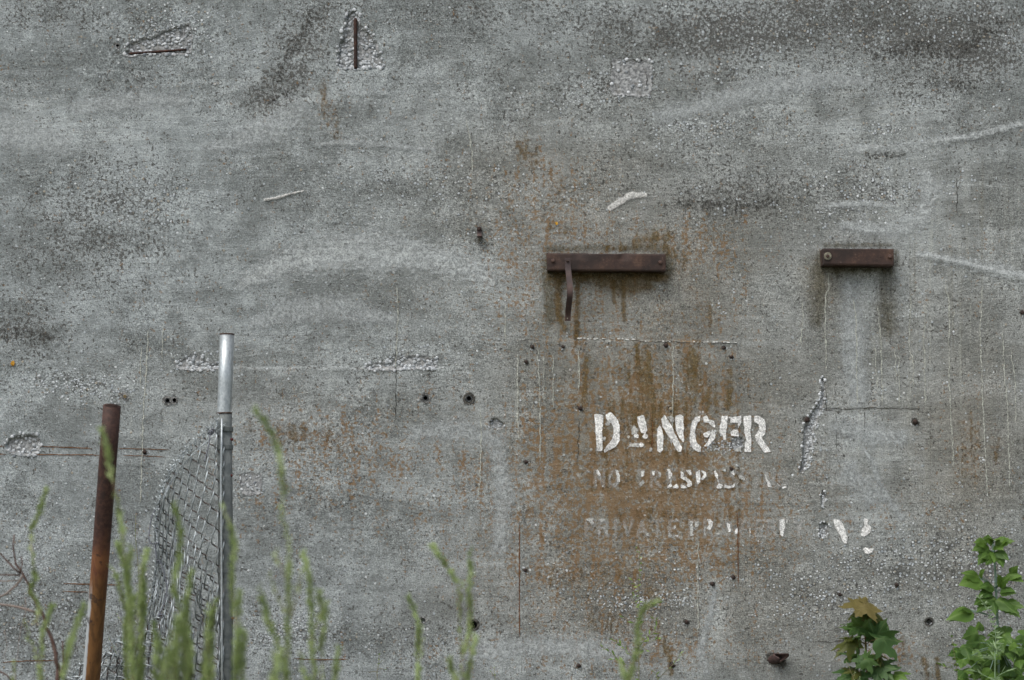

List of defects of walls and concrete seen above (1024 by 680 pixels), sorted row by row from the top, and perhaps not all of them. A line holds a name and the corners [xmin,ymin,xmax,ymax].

spalling [115,7,214,58]
spalling [336,8,385,71]
corrosion [550,273,667,347]
spalling [4,431,43,458]
corrosion [591,425,650,493]
corrosion [608,340,734,465]
spalling [798,375,827,473]